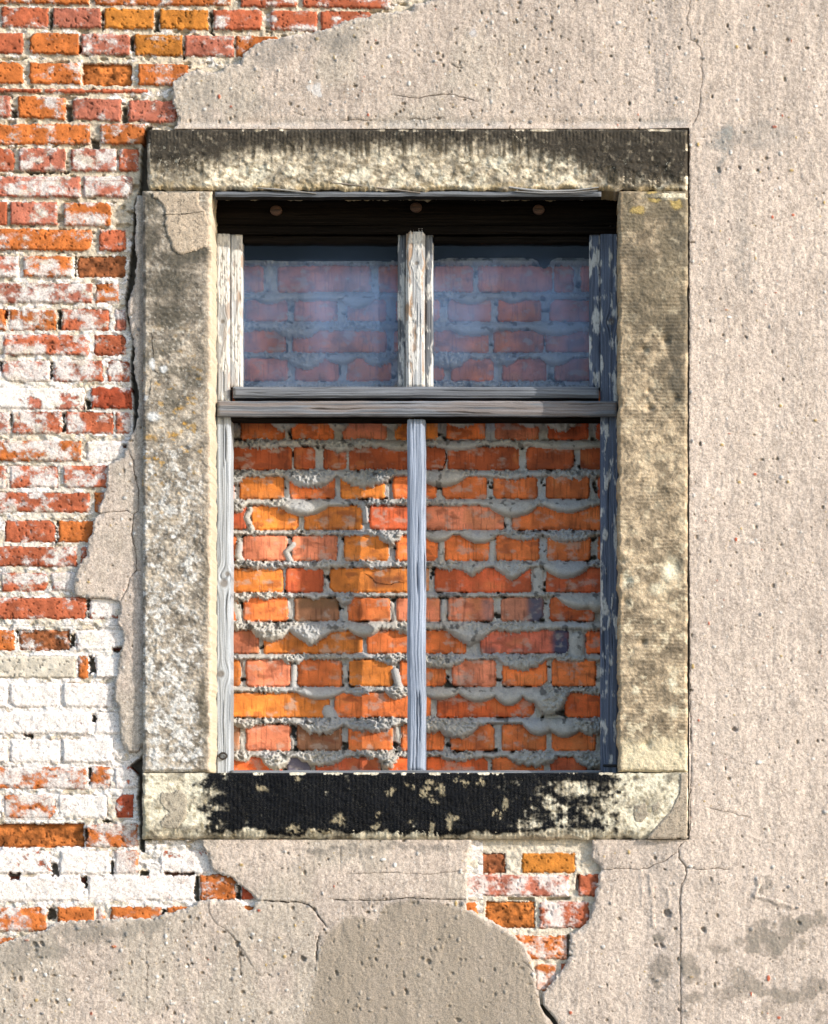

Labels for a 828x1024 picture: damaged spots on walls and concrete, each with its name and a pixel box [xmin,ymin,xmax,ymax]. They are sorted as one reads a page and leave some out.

crack [104,452,139,600]
peeling [0,17,267,946]
crack [604,1,751,1024]
water stain [143,446,626,838]
crack [209,904,258,974]
crack [263,850,468,958]
flaking render [457,838,612,1024]